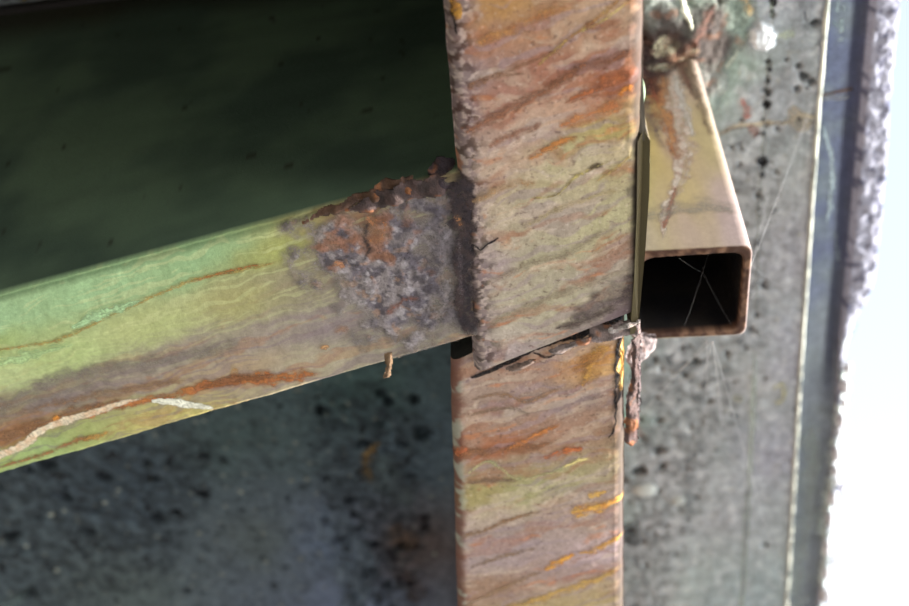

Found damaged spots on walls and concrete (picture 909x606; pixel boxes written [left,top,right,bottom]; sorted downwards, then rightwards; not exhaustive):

corrosion [470,0,624,86]
corrosion [466,50,633,133]
corrosion [643,7,715,235]
corrosion [534,156,630,199]
corrosion [302,156,496,335]
corrosion [0,348,314,441]
corrosion [548,275,657,446]
corrosion [3,432,107,466]
corrosion [453,425,587,484]
corrosion [465,512,535,536]
corrosion [572,491,623,517]
corrosion [468,534,622,606]